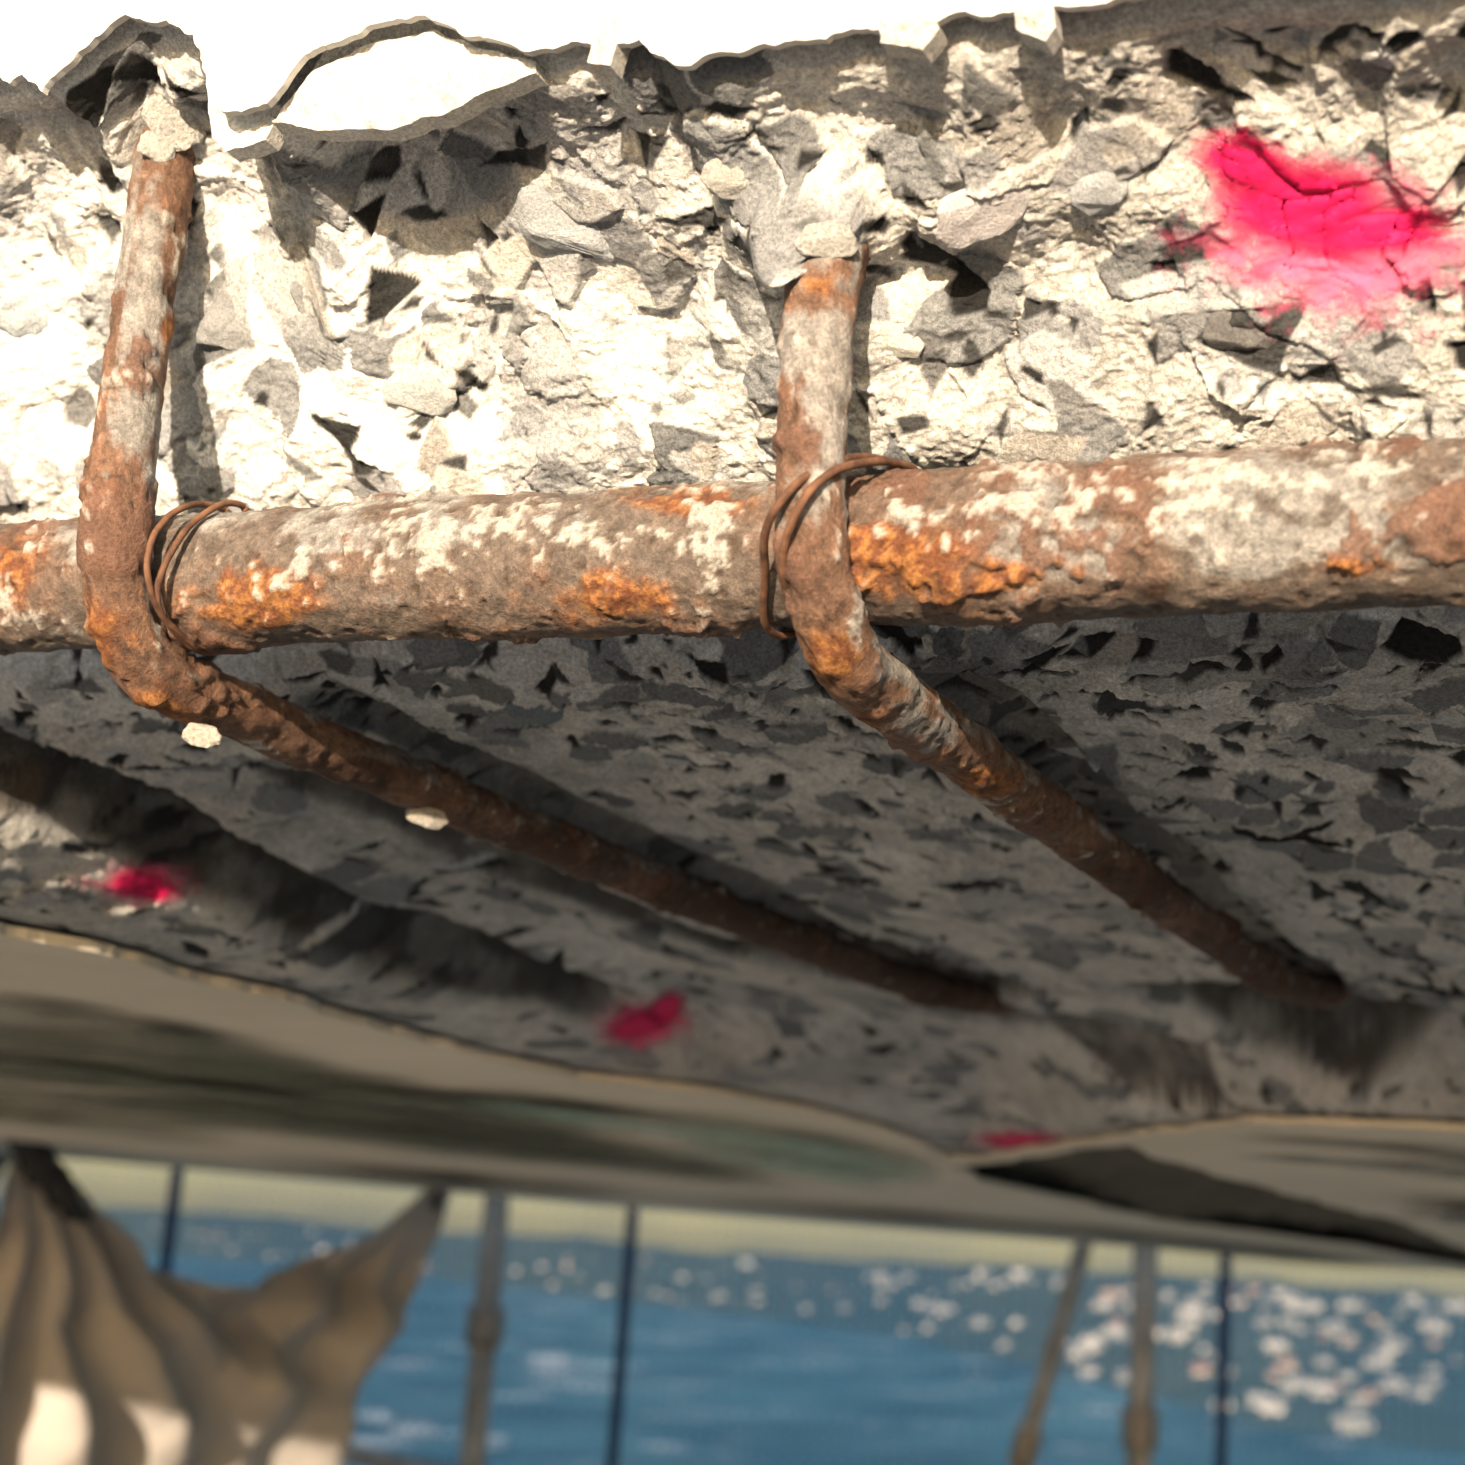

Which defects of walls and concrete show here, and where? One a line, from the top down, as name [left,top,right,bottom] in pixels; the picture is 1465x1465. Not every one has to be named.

spalling [0,0,1465,524]
spalling [0,605,1465,1155]